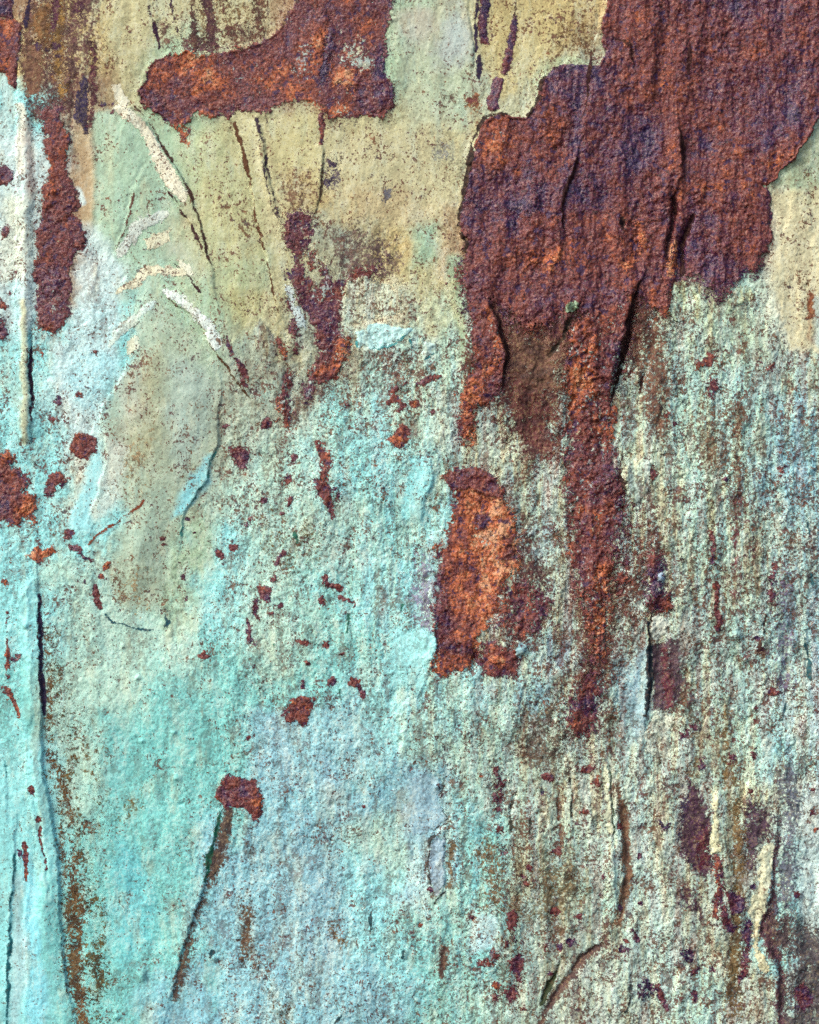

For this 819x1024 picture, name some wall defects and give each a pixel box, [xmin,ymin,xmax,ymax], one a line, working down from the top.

corrosion [100,0,397,149]
corrosion [31,103,88,338]
corrosion [260,208,390,432]
corrosion [428,0,819,747]
corrosion [0,395,98,532]
crack [37,593,48,716]
crack [643,621,654,717]
corrosion [214,770,264,827]